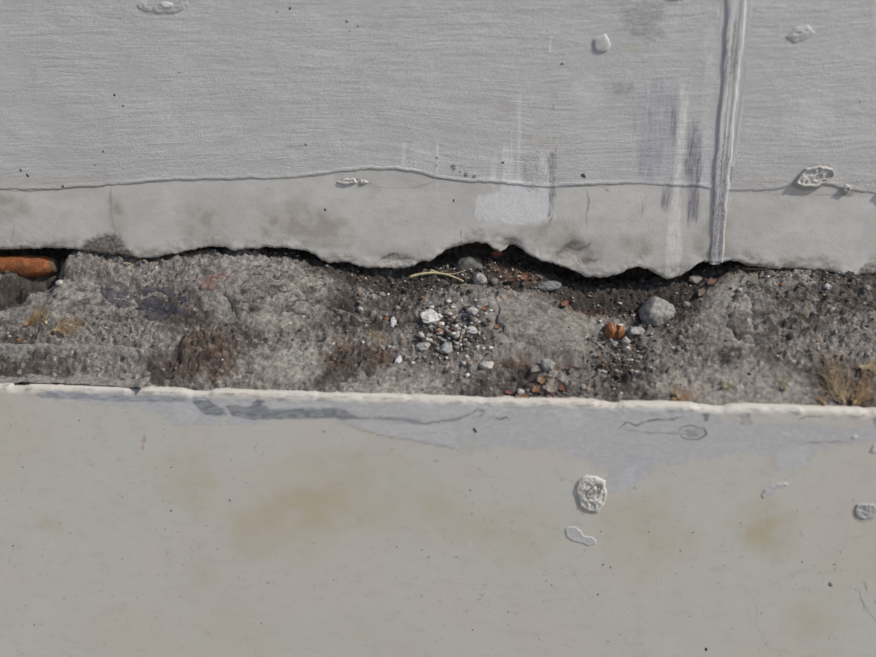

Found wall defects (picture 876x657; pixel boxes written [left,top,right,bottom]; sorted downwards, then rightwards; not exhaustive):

damp [603,0,752,279]